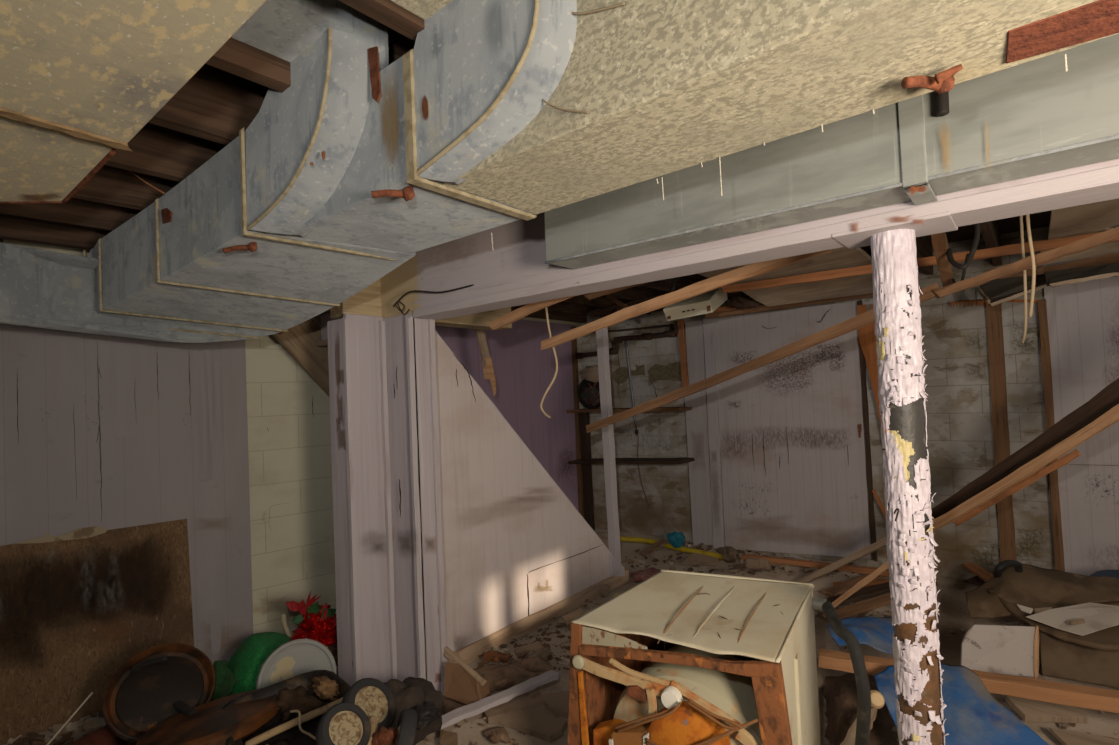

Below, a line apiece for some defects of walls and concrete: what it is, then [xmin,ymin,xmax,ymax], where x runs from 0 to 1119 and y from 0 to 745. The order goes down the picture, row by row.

peeling [887,331,928,405]
peeling [897,492,940,630]
peeling [903,696,949,736]